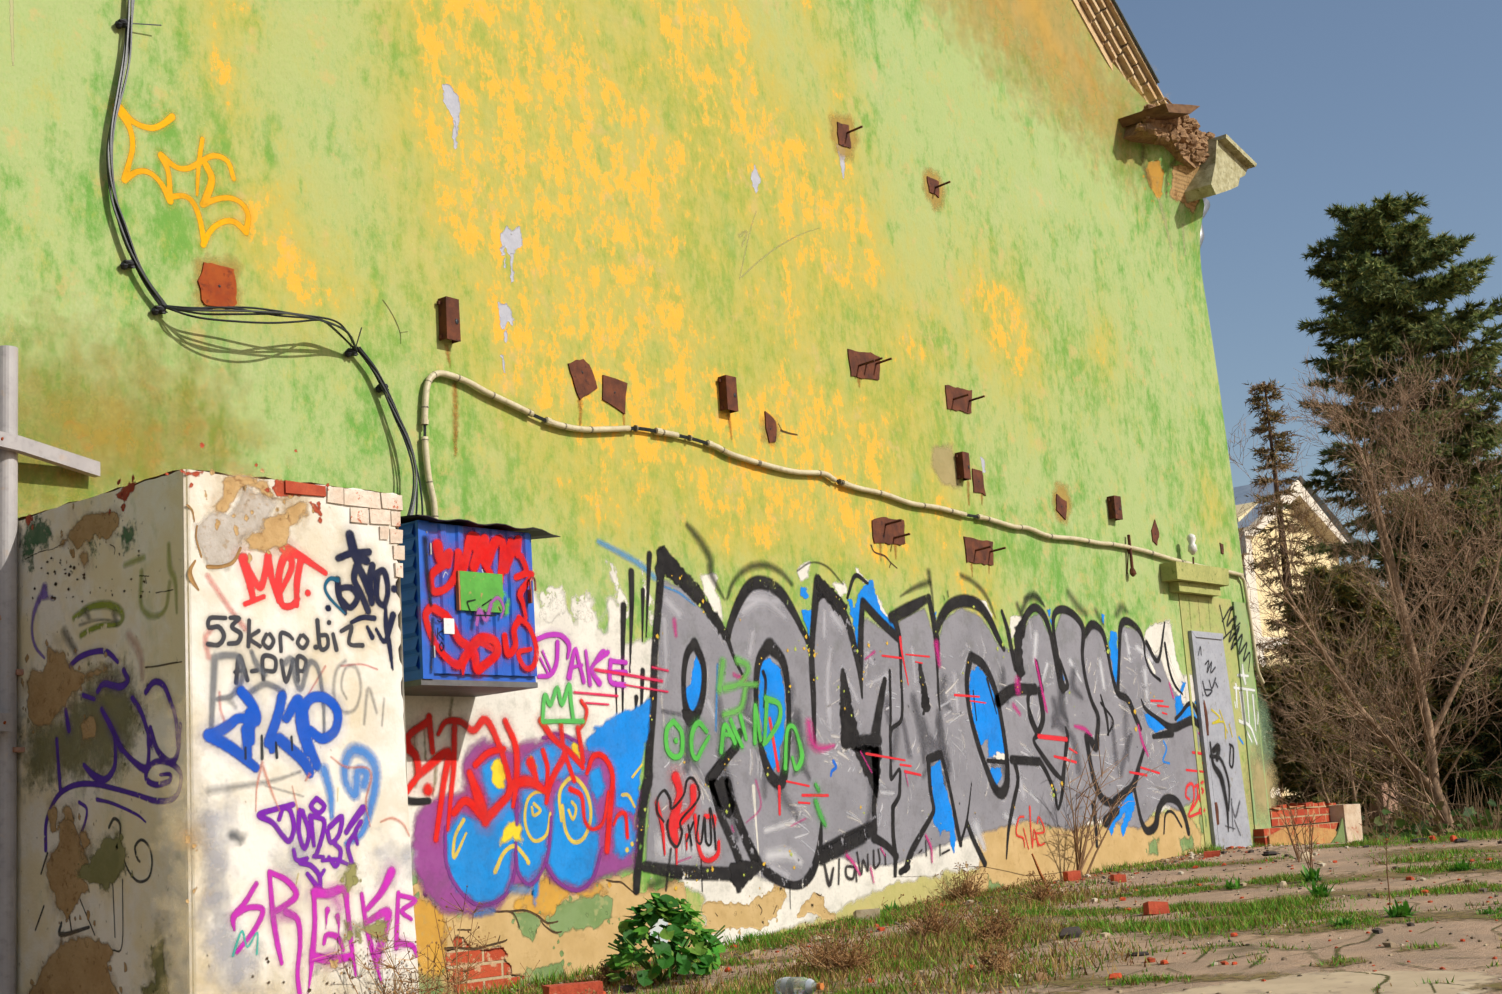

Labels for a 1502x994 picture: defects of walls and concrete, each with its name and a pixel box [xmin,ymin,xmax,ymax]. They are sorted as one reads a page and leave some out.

rust [831,117,857,157]
spalling [165,463,329,563]
spalling [21,632,107,740]
spalling [29,805,133,994]
peeling [141,940,169,994]
spalling [308,864,836,994]